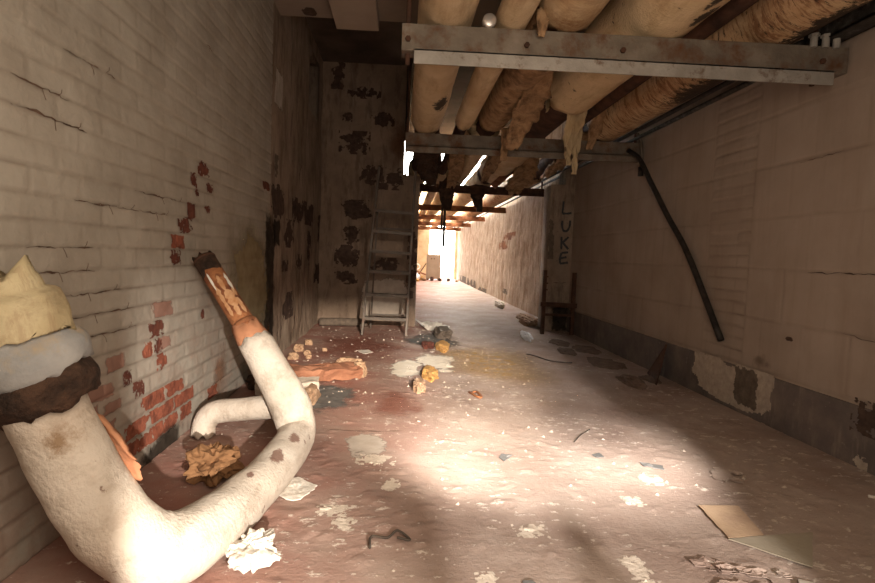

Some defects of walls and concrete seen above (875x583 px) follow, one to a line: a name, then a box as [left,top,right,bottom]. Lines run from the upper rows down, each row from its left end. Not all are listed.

crack [10,72,85,132]
peeling [170,160,213,265]
water stain [361,278,407,317]
peeling [142,300,173,371]
peeling [87,353,194,455]
peeling [207,383,218,400]
peeling [692,351,775,416]
peeling [849,397,875,440]